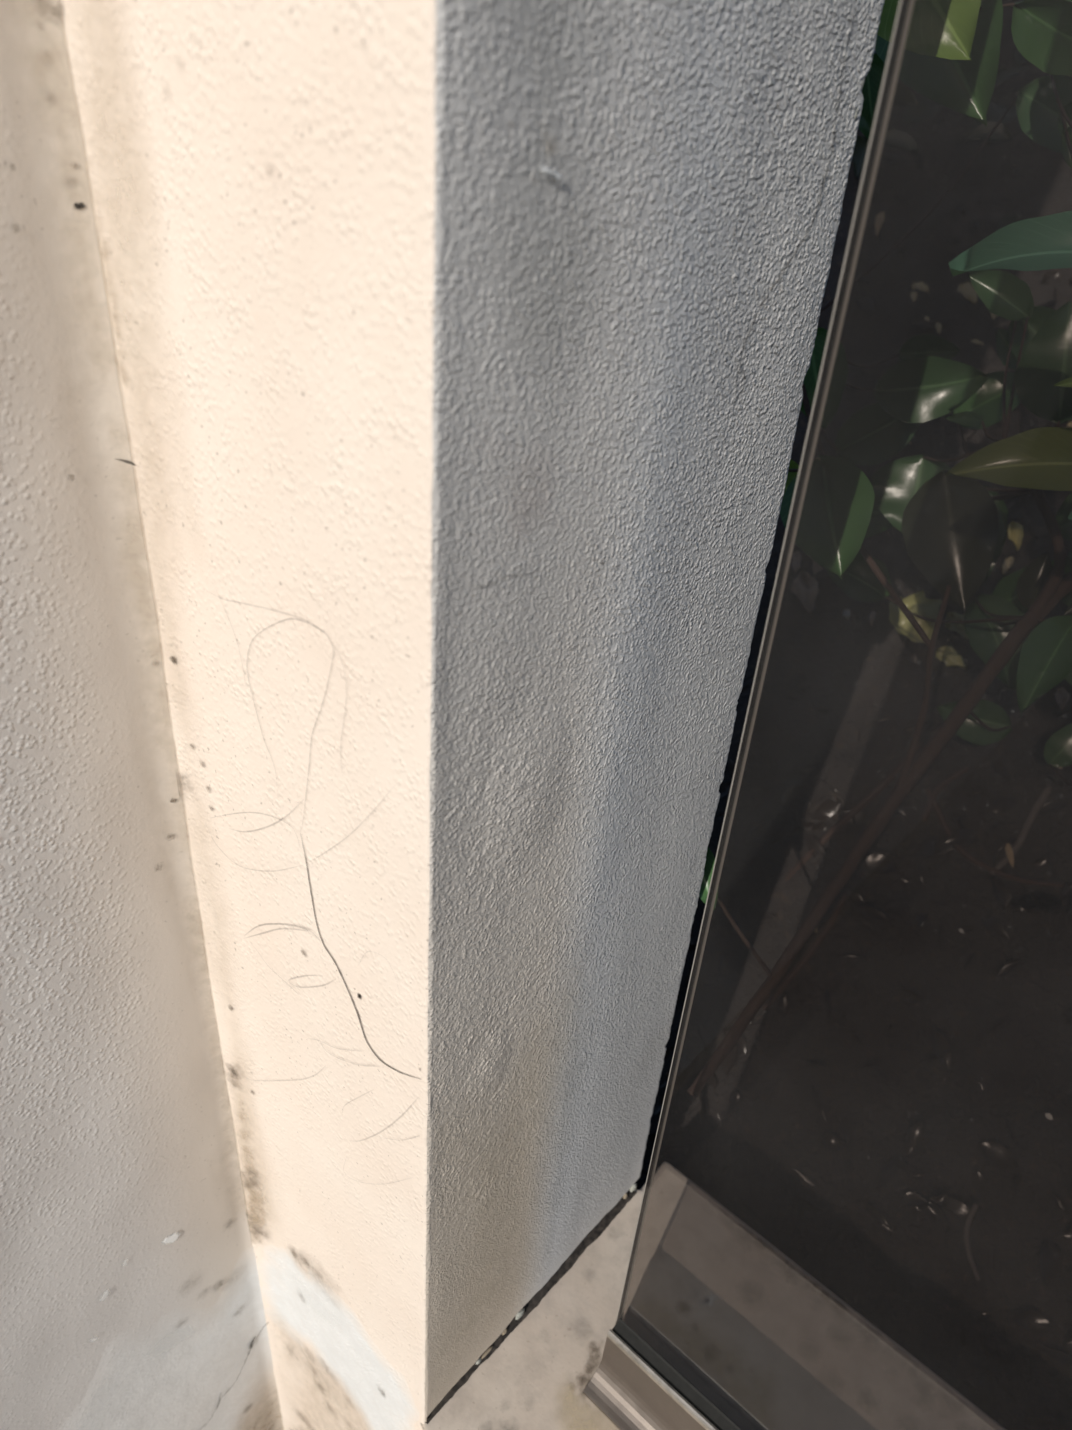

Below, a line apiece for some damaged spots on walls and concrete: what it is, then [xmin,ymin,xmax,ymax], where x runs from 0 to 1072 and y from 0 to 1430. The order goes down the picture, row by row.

crack [202,1322,269,1428]